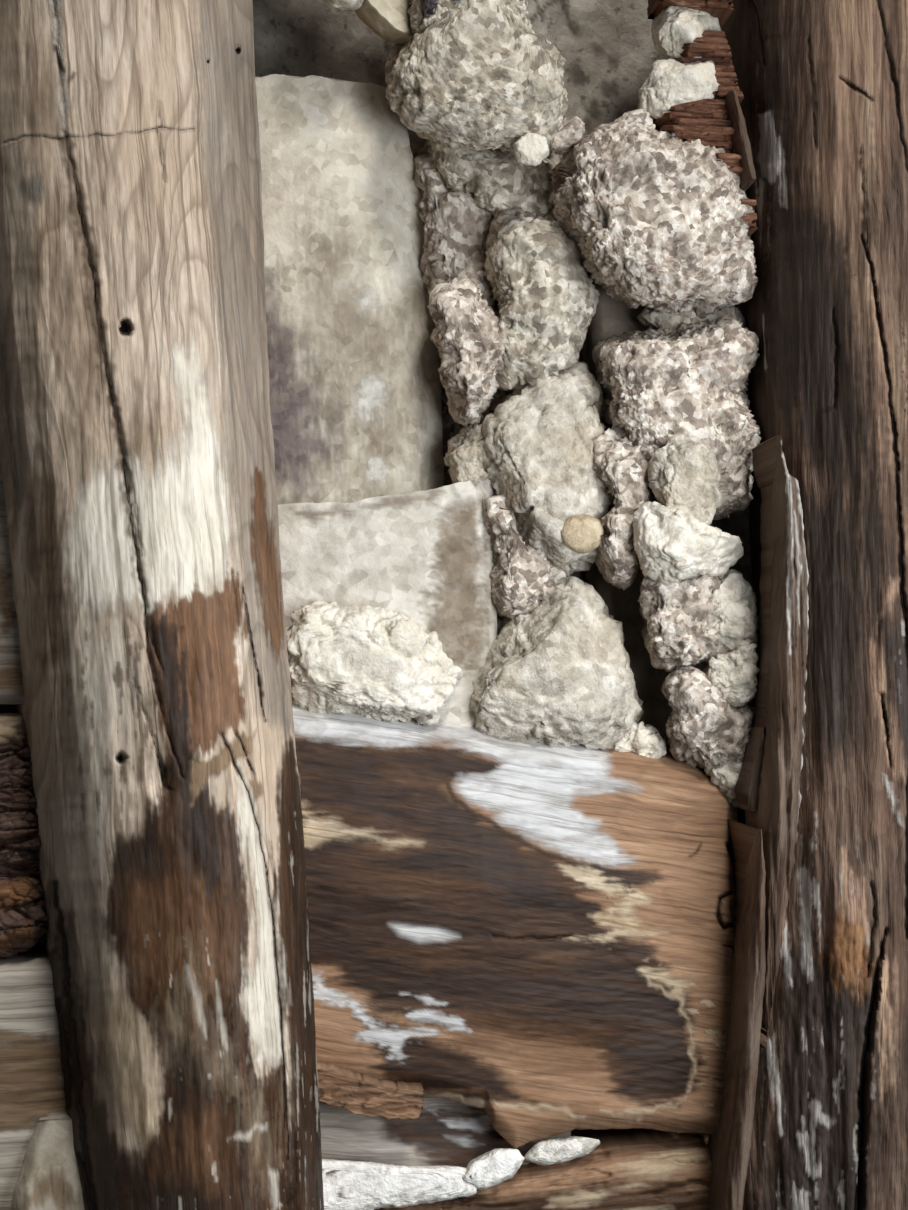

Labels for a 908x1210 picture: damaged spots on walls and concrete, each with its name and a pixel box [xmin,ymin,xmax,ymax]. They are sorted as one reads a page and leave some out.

crack [55,45,75,79]
crack [807,0,908,171]
crack [73,167,181,789]
crack [822,312,838,412]
crack [860,150,908,657]
crack [856,694,908,1210]